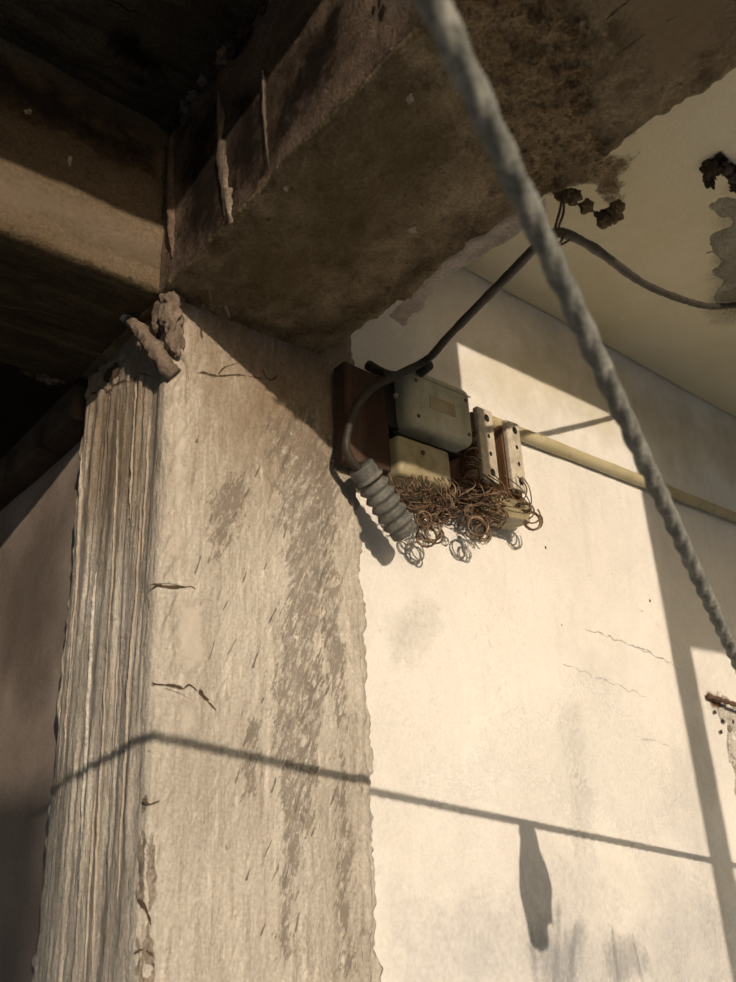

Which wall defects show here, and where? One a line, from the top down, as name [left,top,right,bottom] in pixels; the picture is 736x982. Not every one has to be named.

damp [278,6,340,131]
damp [182,99,265,242]
peeling [699,152,736,315]
spalling [84,350,127,399]
crack [91,370,149,415]
crack [199,363,278,381]
crack [151,581,196,589]
crack [152,682,216,738]
spalling [718,695,736,794]
spalling [135,831,157,982]